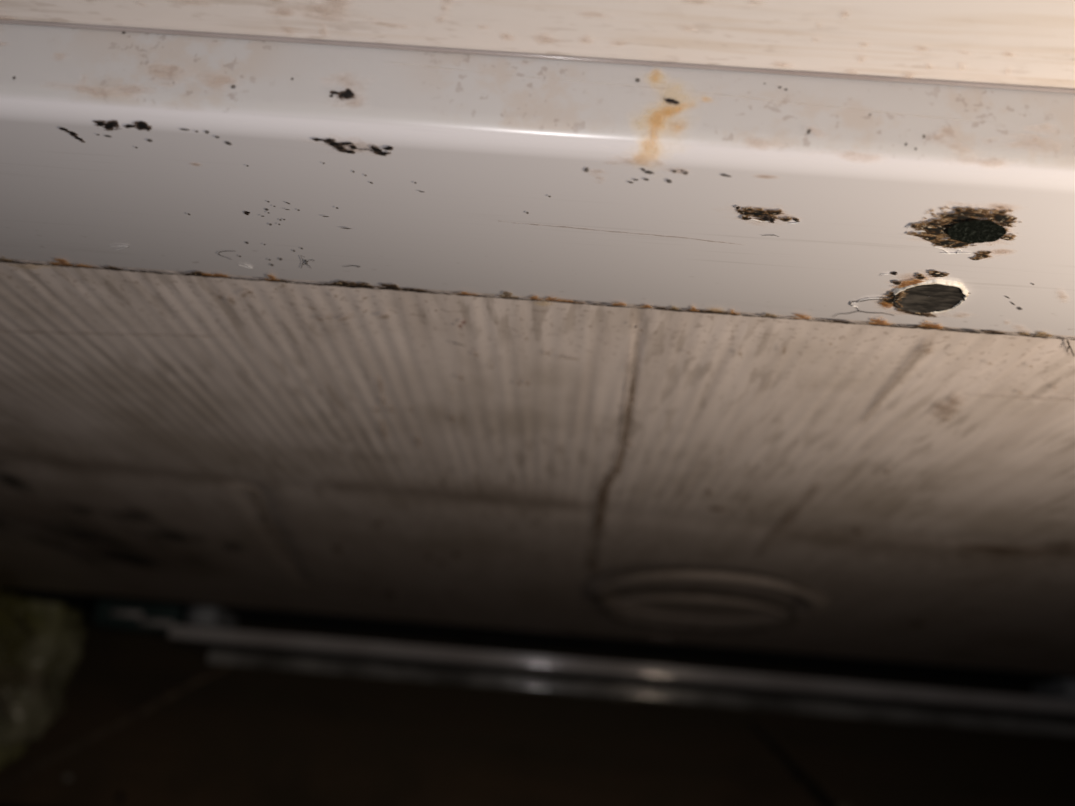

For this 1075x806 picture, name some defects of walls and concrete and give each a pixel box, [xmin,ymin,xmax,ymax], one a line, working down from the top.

rust [653,98,679,136]